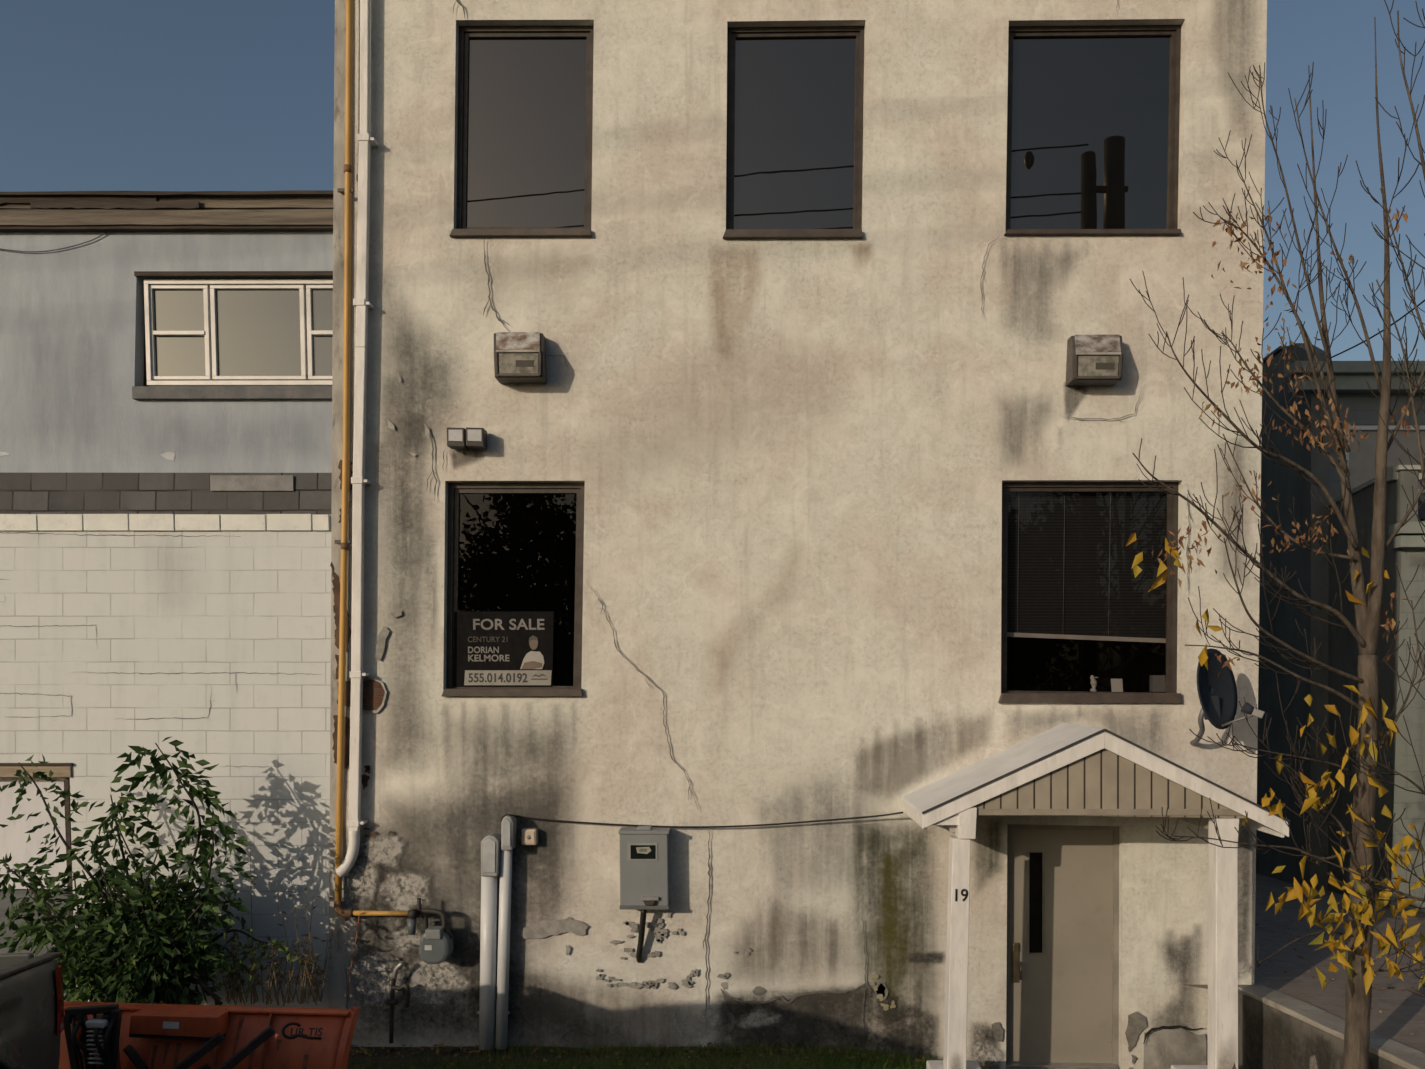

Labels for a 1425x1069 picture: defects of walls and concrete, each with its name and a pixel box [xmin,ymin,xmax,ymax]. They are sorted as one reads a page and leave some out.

crack [483,238,509,331]
leakage [395,333,443,570]
peeling [343,827,469,1007]
leakage [355,740,599,1037]
peeling [519,917,589,955]
peeling [610,910,684,960]
peeling [595,969,699,989]
crack [587,584,711,1039]
flaking render [670,973,896,1049]
leakage [719,831,943,1059]